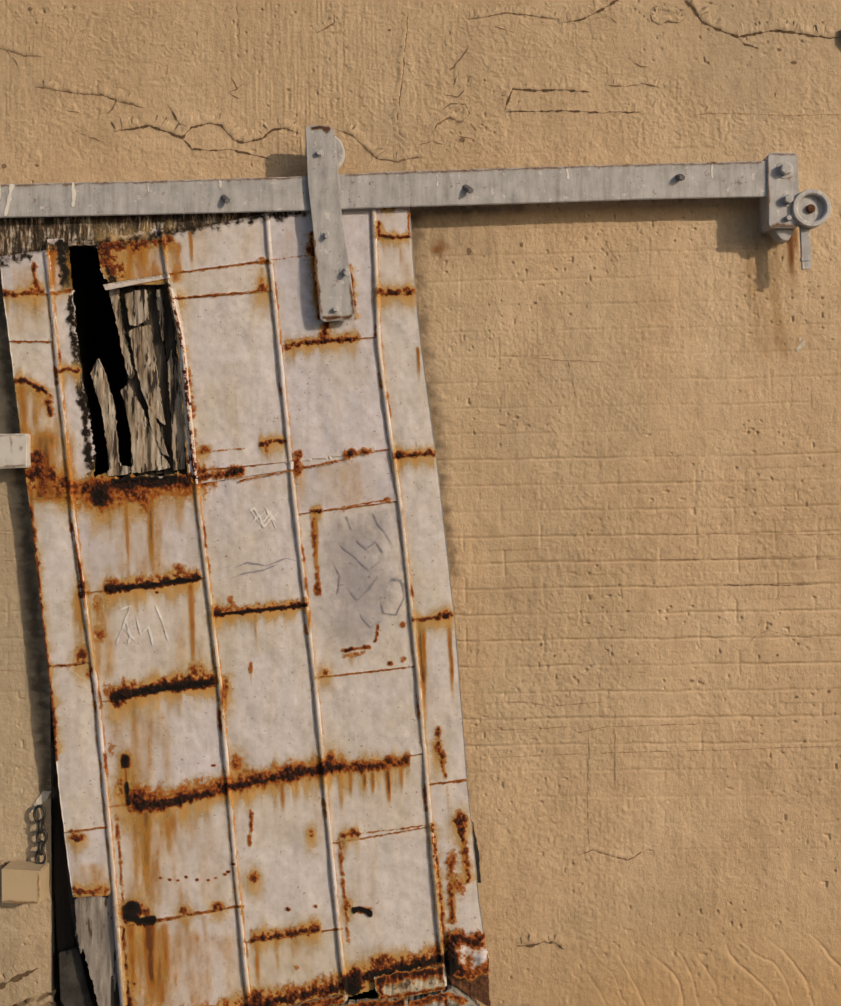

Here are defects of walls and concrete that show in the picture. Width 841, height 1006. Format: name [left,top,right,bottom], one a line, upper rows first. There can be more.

crack [0,39,304,159]
crack [338,0,619,163]
crack [498,57,662,114]
crack [684,0,841,49]
crack [688,111,841,119]
rust [3,231,491,1006]
crack [470,701,841,874]
crack [0,957,48,1006]